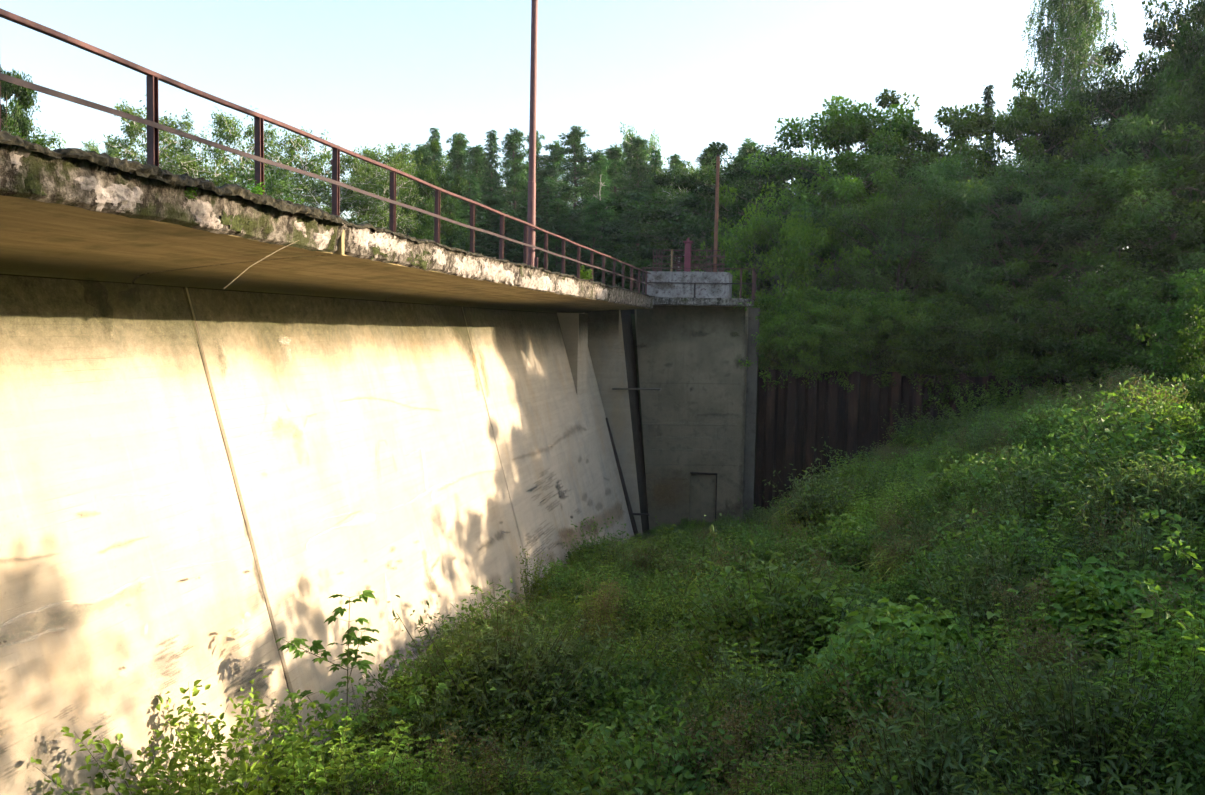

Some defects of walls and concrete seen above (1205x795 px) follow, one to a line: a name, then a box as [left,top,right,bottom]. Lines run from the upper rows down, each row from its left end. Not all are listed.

spalling [9,145,32,171]
spalling [75,176,143,213]
spalling [183,197,223,230]
spalling [294,220,334,250]
spalling [351,226,411,258]